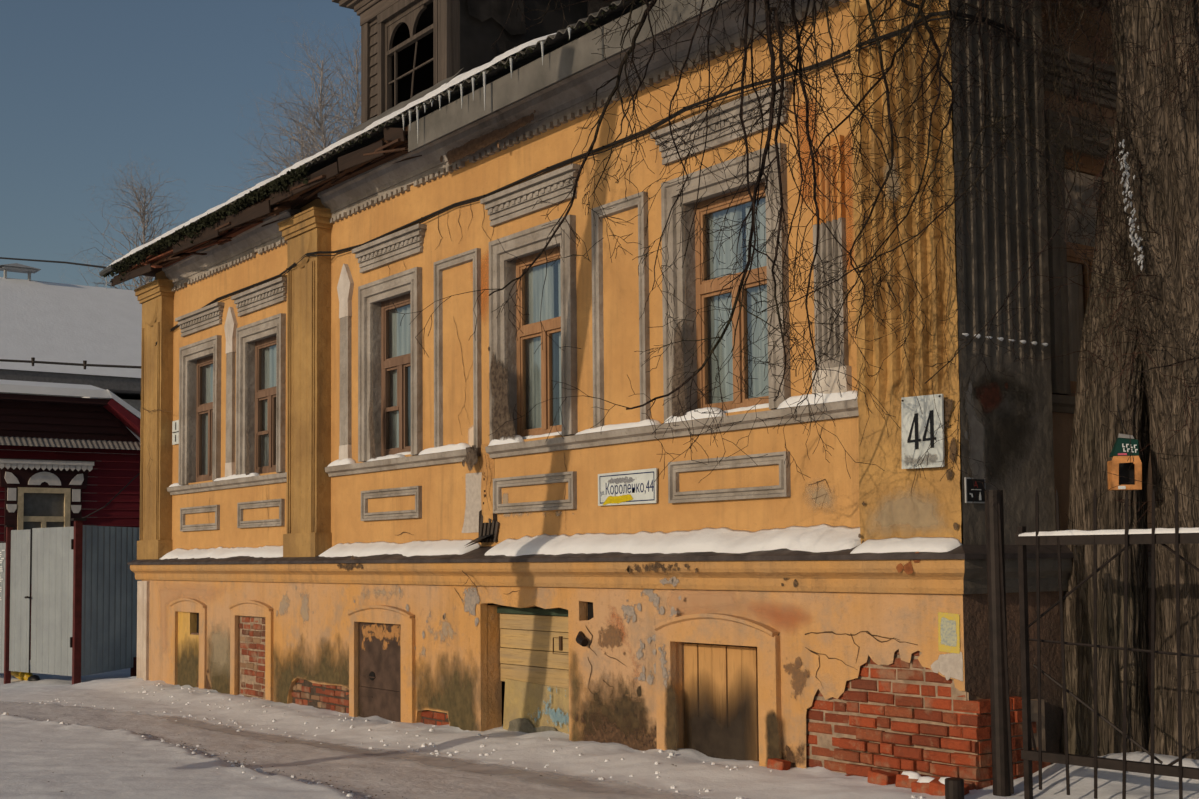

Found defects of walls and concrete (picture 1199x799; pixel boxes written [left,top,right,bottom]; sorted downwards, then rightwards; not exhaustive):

water stain [964,377,1030,479]
flaking render [292,679,349,713]
peeling [361,612,453,655]
water stain [417,660,478,731]
water stain [571,666,579,741]
peeling [598,562,698,697]
crack [805,631,918,685]
flaking render [781,649,993,790]
flaking render [1009,696,1051,780]